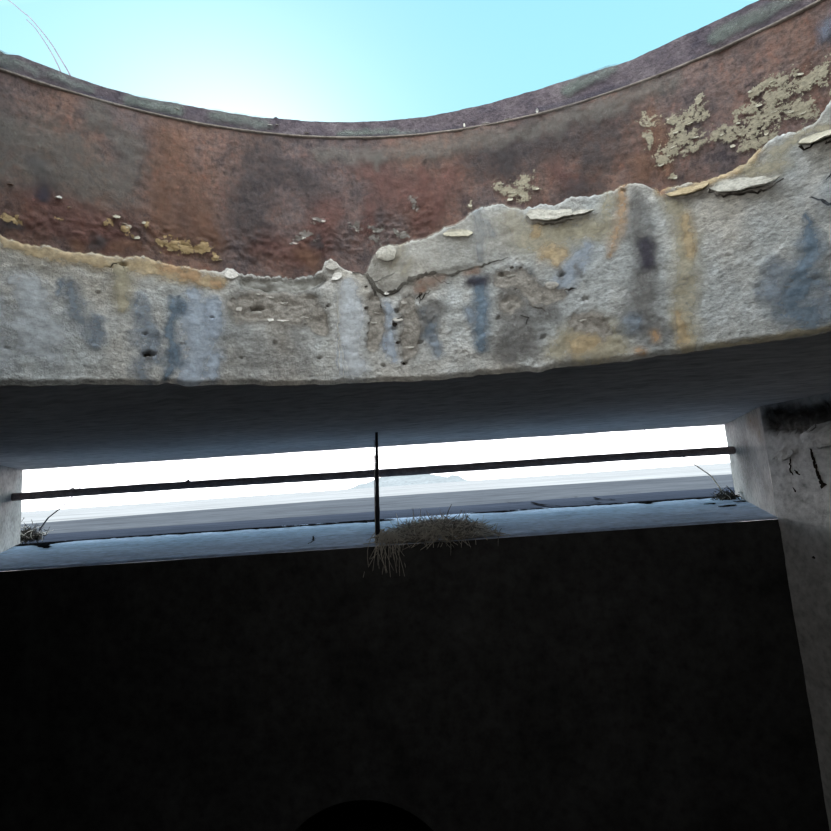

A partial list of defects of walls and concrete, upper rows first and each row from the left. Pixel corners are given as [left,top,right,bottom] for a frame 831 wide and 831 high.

peeling [637,53,831,199]
peeling [0,213,22,225]
leakage [9,277,61,355]
rust [0,187,227,312]
peeling [103,214,140,239]
leakage [133,287,222,387]
peeling [155,234,221,261]
crack [352,257,508,324]
leakage [465,276,559,361]
peeling [491,169,594,226]
leakage [756,213,831,336]
spalling [769,408,831,449]